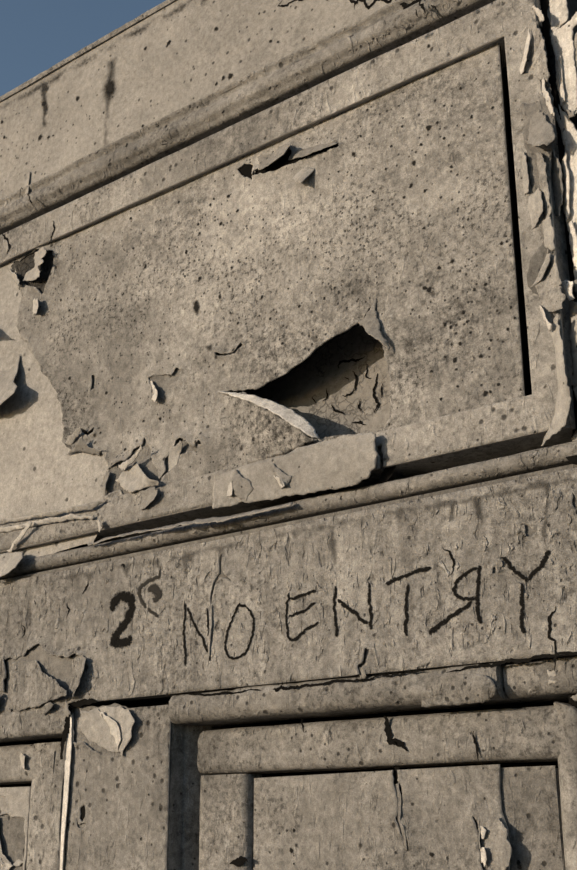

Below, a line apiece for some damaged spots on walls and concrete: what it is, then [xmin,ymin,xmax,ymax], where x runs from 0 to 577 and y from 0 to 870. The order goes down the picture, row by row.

crack [350,0,421,10]
peeling [238,142,339,184]
peeling [520,0,577,446]
peeling [0,247,378,577]
peeling [207,555,231,664]
peeling [358,649,369,679]
peeling [0,645,135,870]
crack [384,715,408,852]
peeling [229,856,248,867]
peeling [476,816,512,870]